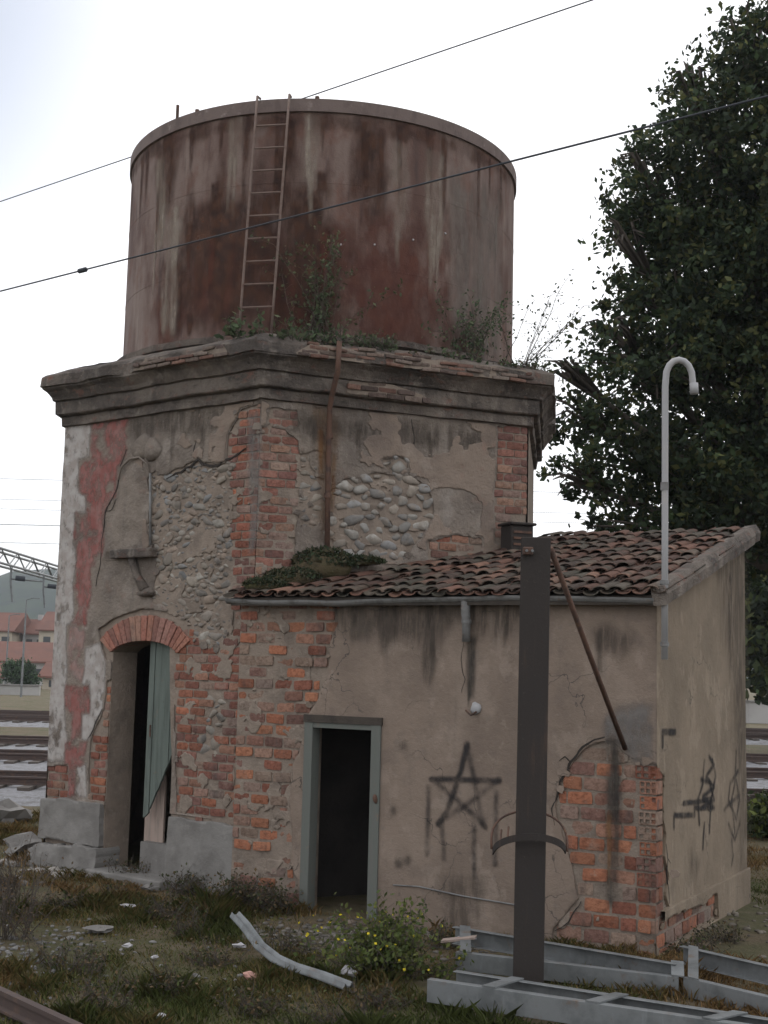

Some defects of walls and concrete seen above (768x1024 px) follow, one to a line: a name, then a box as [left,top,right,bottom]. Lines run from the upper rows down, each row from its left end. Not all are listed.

rust [131,139,175,251]
rust [172,119,294,333]
rust [343,120,453,208]
crack [166,442,246,480]
spalling [135,401,528,911]
leakage [467,638,476,701]
spalling [553,741,717,956]